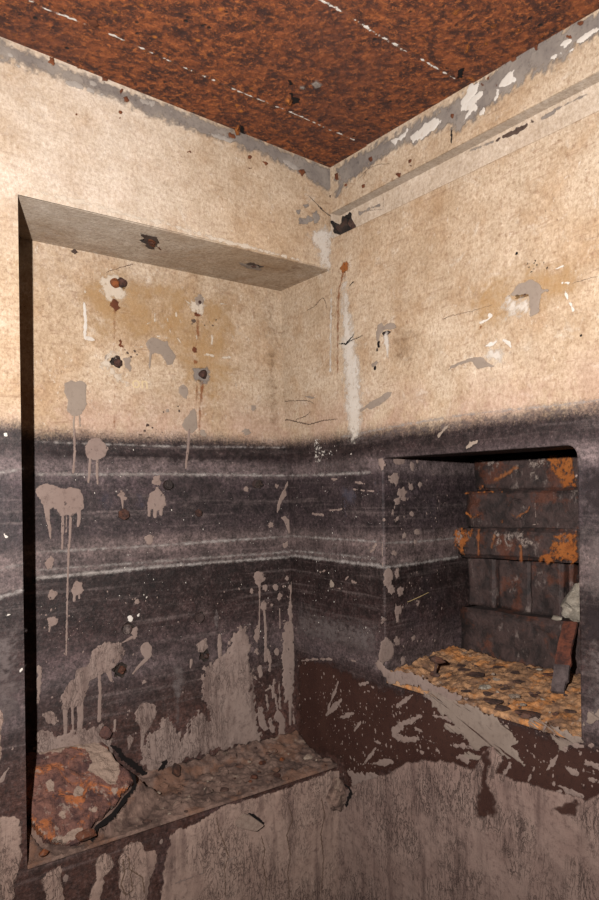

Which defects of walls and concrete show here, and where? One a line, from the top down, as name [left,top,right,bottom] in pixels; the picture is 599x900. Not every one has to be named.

peeling [0,13,599,198]
corrosion [285,80,321,105]
spalling [296,204,323,224]
spalling [506,260,564,316]
water stain [114,282,445,477]
corrosion [529,453,576,487]
water stain [36,540,458,579]
corrosion [454,528,480,555]
corrosion [492,531,533,561]
corrosion [540,533,578,564]
water stain [0,626,23,718]
water stain [299,658,599,817]